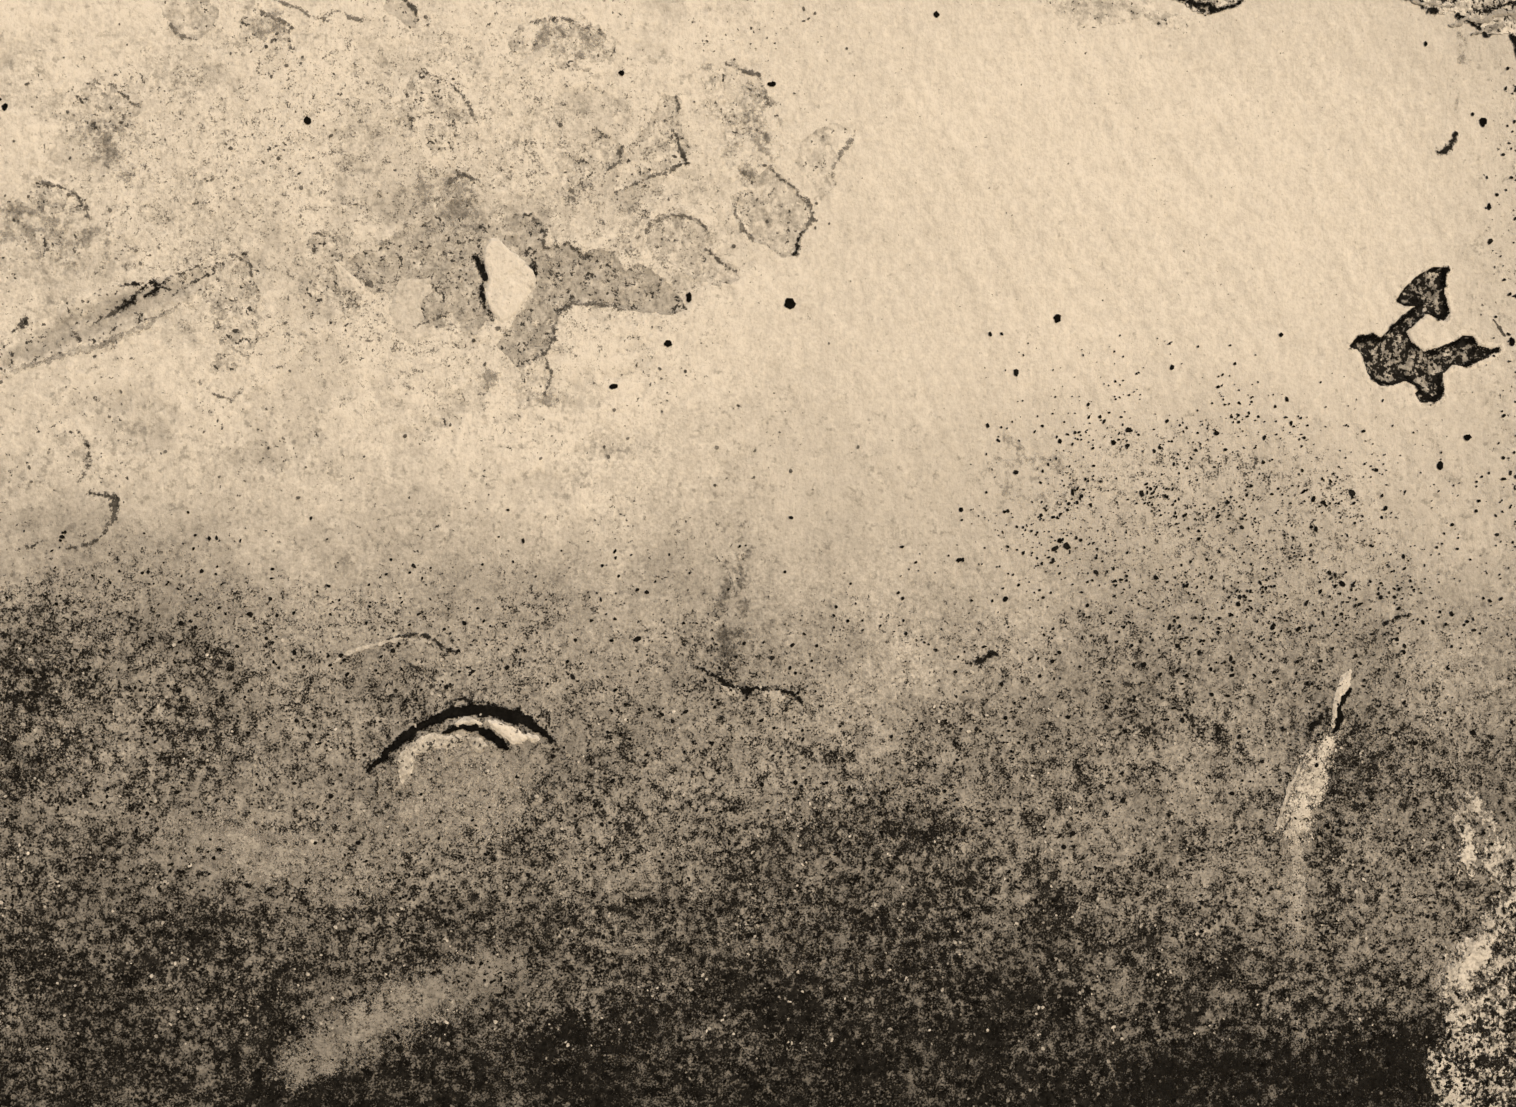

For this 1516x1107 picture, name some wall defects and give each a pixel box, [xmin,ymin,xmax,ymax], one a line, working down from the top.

spalling [1036,0,1243,36]
spalling [1402,0,1516,55]
peeling [1436,131,1458,155]
spalling [1343,261,1507,409]
crack [332,632,576,784]
water stain [0,335,1516,1107]